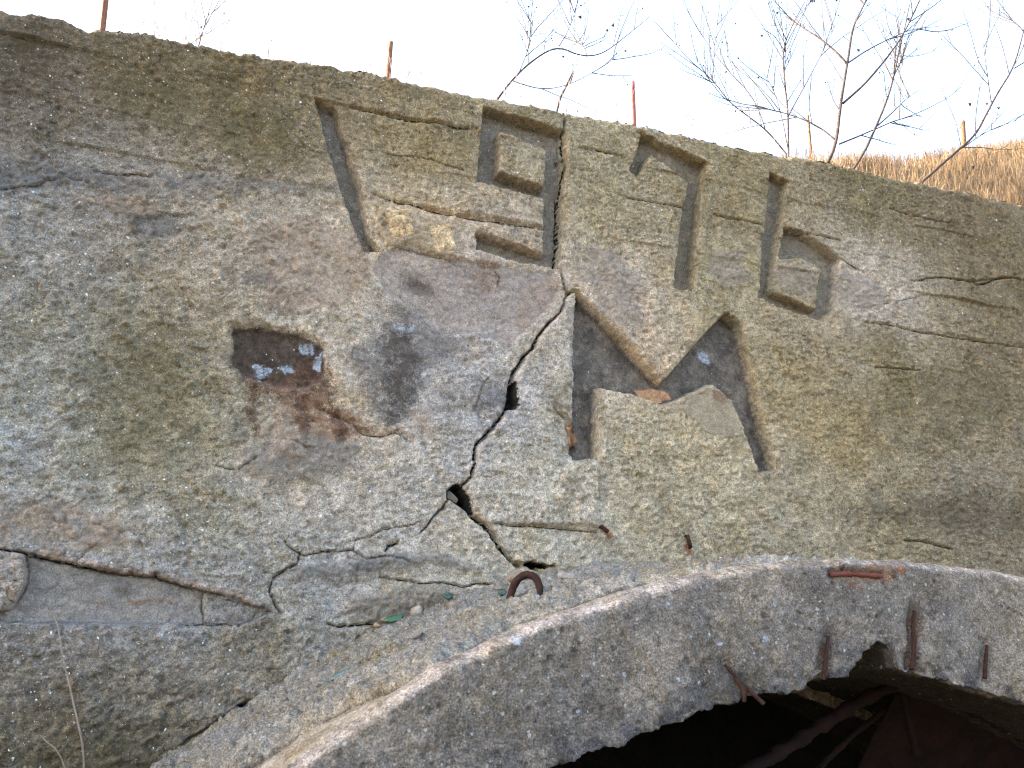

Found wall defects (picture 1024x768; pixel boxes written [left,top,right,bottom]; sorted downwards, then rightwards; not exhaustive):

crack [1,171,148,191]
crack [552,134,563,269]
corrosion [228,358,364,443]
crack [266,292,574,613]
crack [0,546,168,582]
corrosion [836,565,904,589]
crack [328,621,373,629]